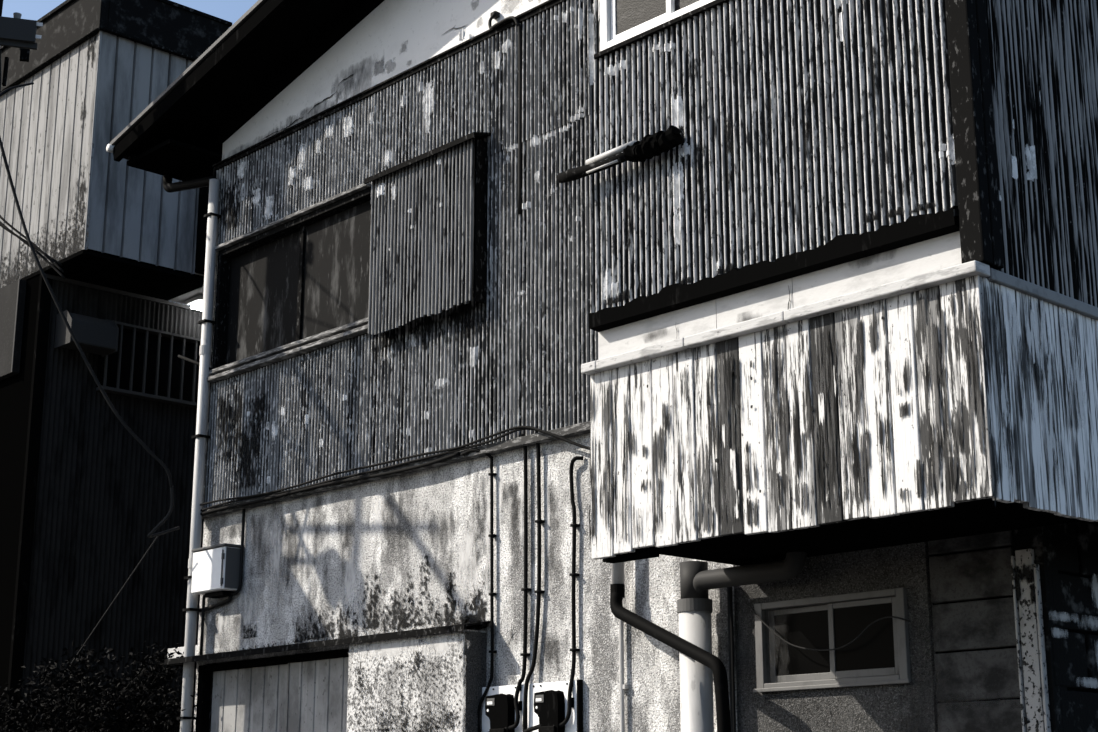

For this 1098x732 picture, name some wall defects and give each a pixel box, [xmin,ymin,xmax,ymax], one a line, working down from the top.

peeling [374,41,411,75]
peeling [480,39,511,74]
peeling [589,351,757,543]
peeling [765,284,1085,515]
damp [208,485,524,732]